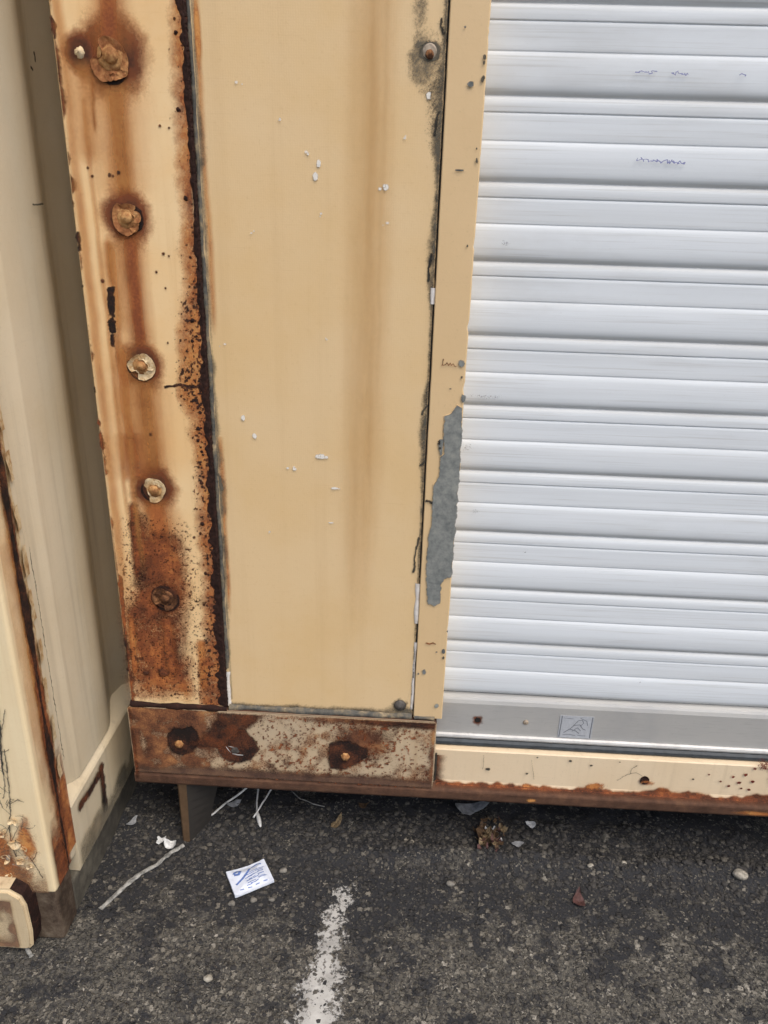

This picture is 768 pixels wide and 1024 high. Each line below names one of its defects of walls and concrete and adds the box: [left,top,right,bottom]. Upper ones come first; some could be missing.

rust [50,0,768,816]
peeling [425,395,466,606]
rust [0,822,36,884]
rust [7,524,76,884]